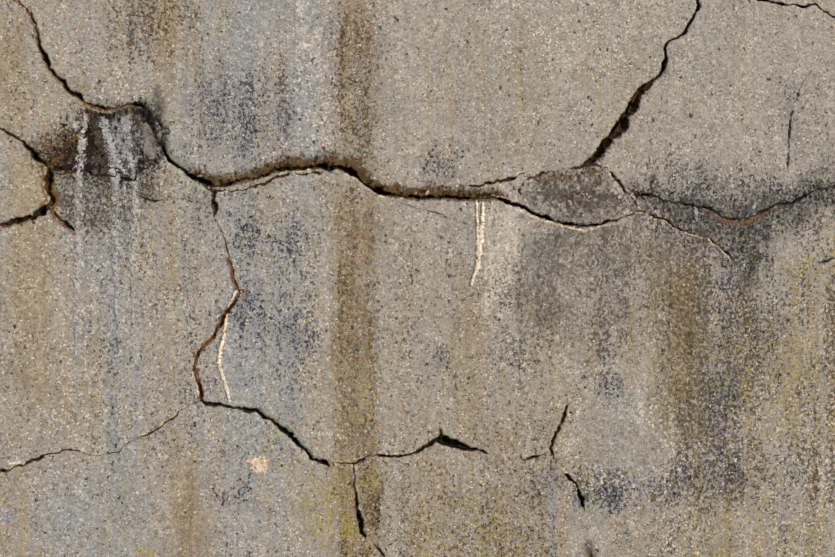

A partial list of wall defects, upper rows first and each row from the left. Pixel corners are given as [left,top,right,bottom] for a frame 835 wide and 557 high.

crack [757,0,835,18]
crack [786,69,813,172]
crack [0,0,733,472]
crack [632,186,835,226]
damp [470,156,835,466]
crack [337,425,488,557]
crack [520,403,585,510]